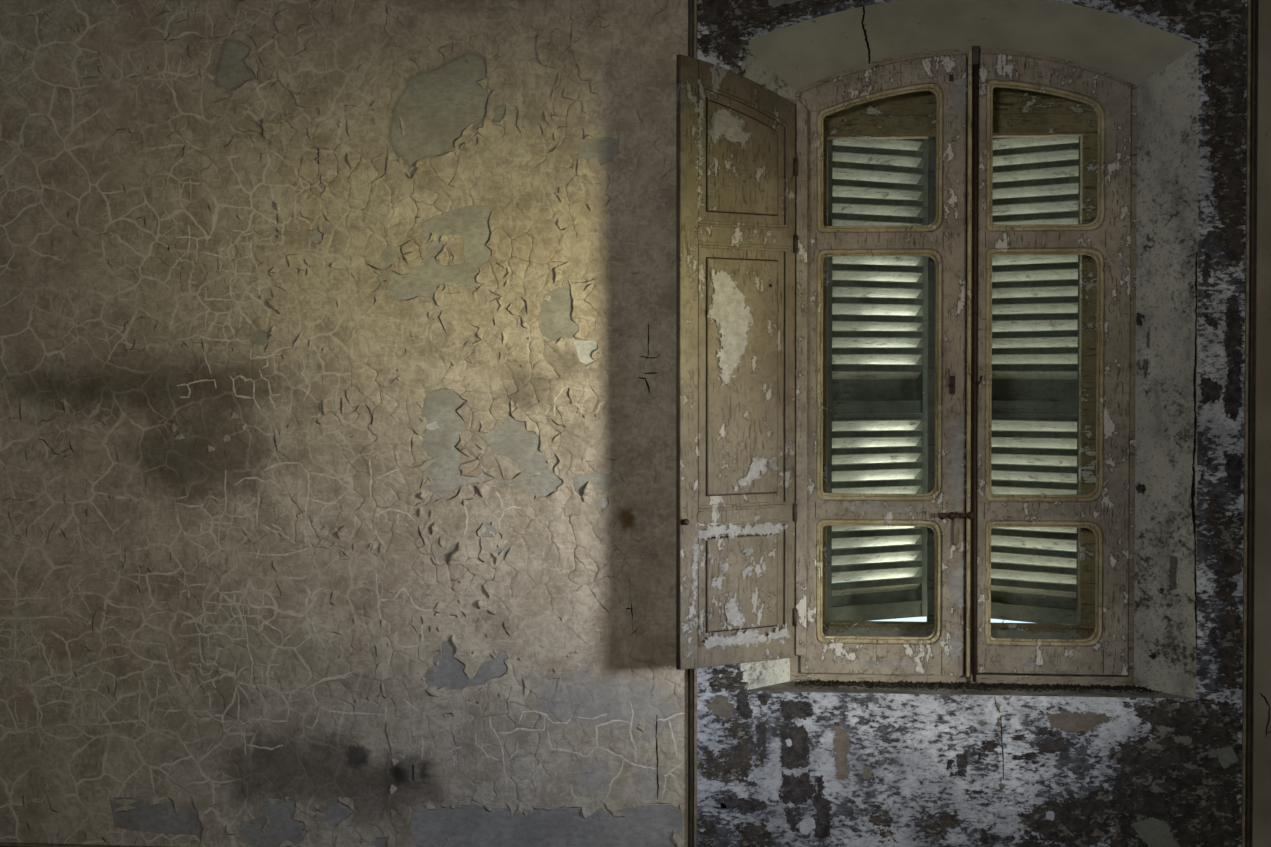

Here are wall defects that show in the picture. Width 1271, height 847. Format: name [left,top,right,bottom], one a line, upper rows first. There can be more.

crack [675,0,688,26]
crack [861,5,870,64]
crack [540,72,591,157]
peeling [366,205,499,308]
peeling [535,279,604,368]
peeling [409,382,620,573]
peeling [685,521,791,657]
peeling [422,633,514,708]
peeling [410,666,873,847]